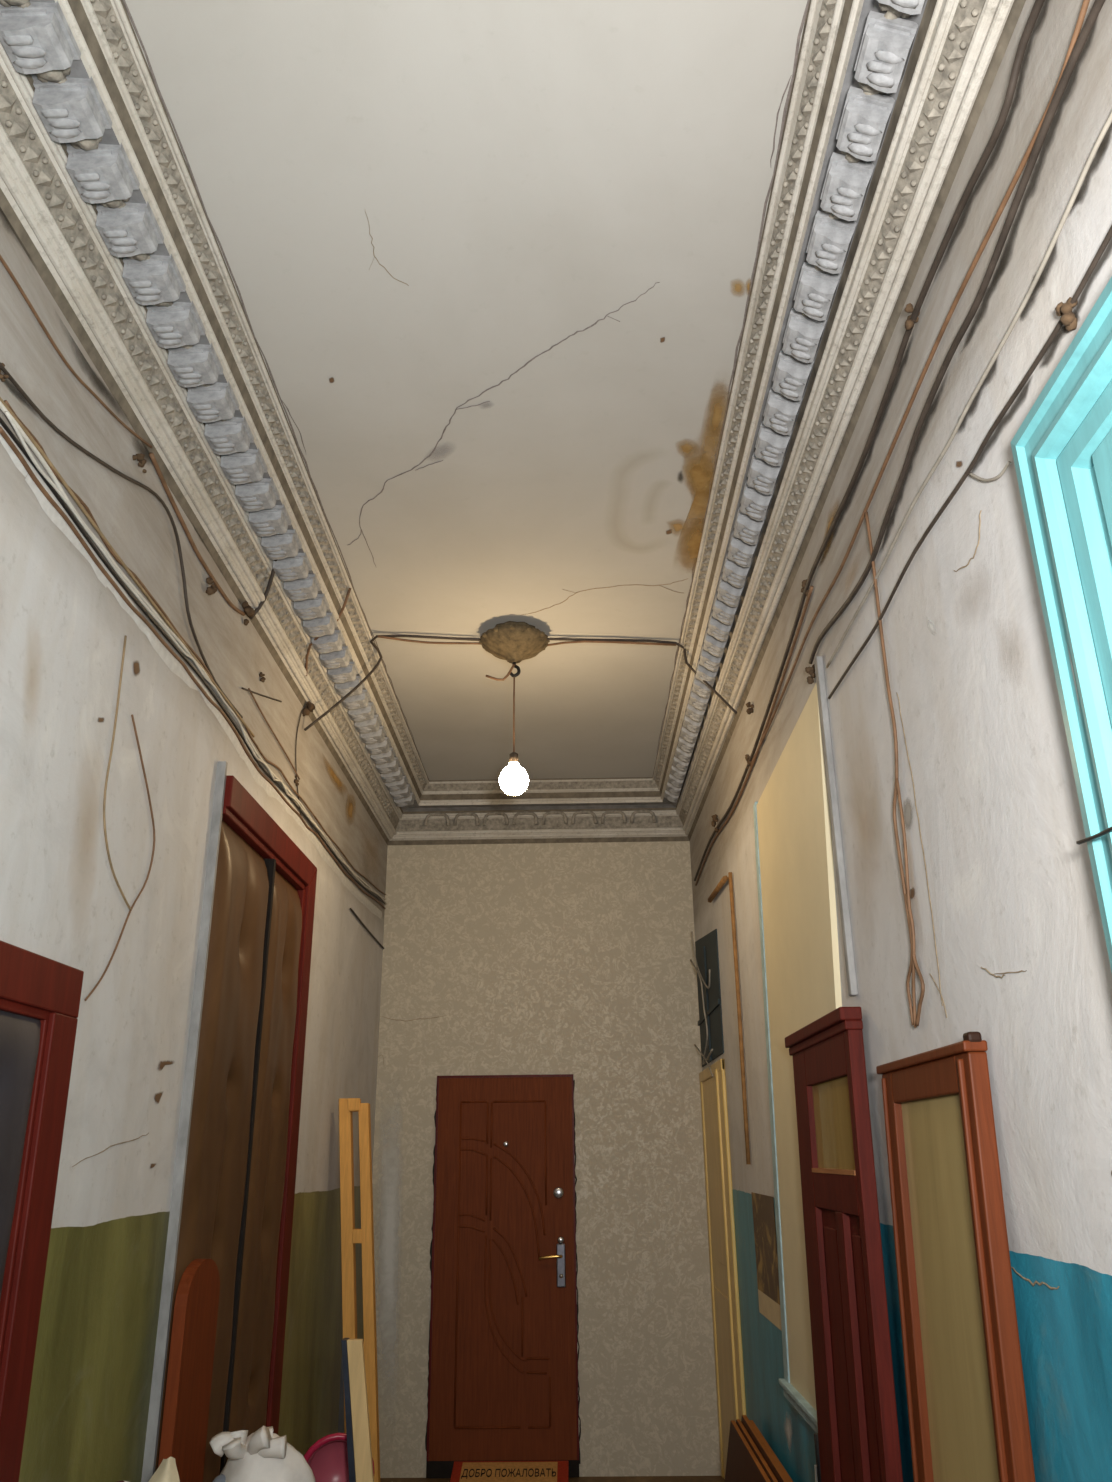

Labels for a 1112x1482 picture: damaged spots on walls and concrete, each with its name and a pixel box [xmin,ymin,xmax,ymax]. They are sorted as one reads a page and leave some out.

crack [122,0,660,748]
damp [671,397,724,561]